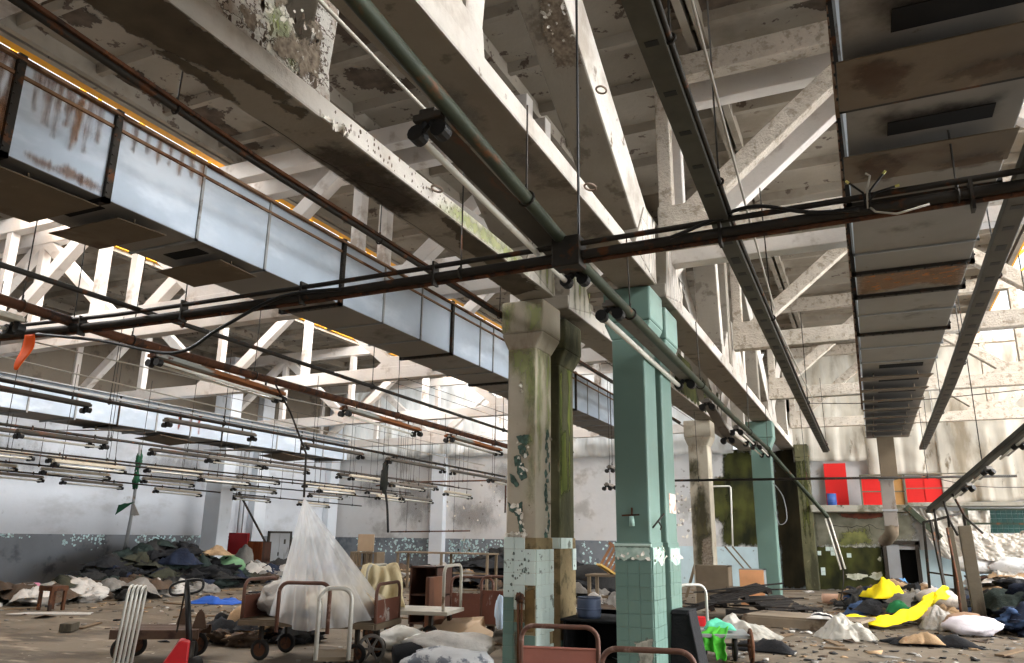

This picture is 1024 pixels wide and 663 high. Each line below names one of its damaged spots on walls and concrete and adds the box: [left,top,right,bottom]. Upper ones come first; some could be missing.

peeling [228,0,324,89]
rust [38,75,102,146]
rust [29,155,96,188]
leakage [441,217,507,265]
leakage [490,269,548,295]
rust [860,265,963,294]
peeling [544,429,552,538]
peeling [62,533,105,550]
peeling [135,535,201,543]
peeling [356,537,429,561]
peeling [446,435,535,632]
spalling [582,485,714,566]